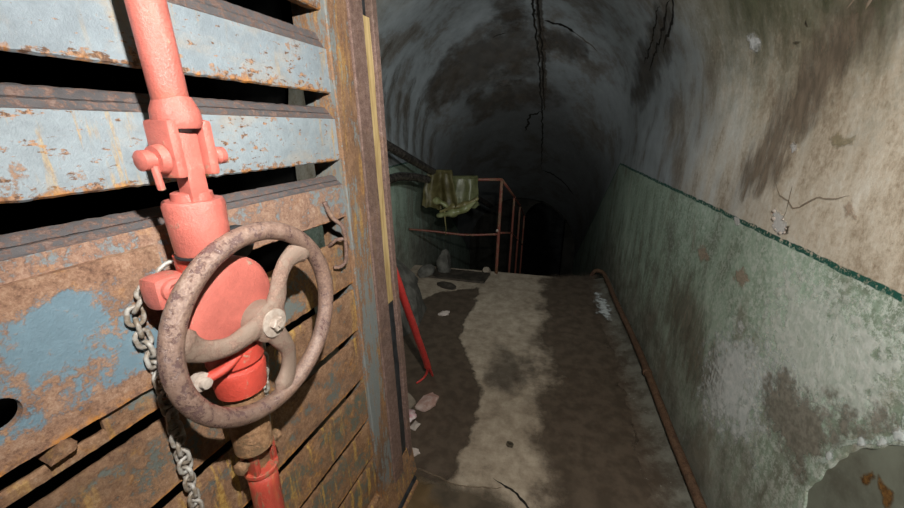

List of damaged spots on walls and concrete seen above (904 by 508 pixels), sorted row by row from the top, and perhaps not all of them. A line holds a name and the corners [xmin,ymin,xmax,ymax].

water stain [428,0,582,122]
crack [525,0,597,195]
crack [644,0,674,70]
water stain [742,0,876,199]
water stain [403,288,509,508]
water stain [532,274,651,508]
peeling [763,367,904,483]
crack [417,468,529,508]
corrosion [862,472,893,508]